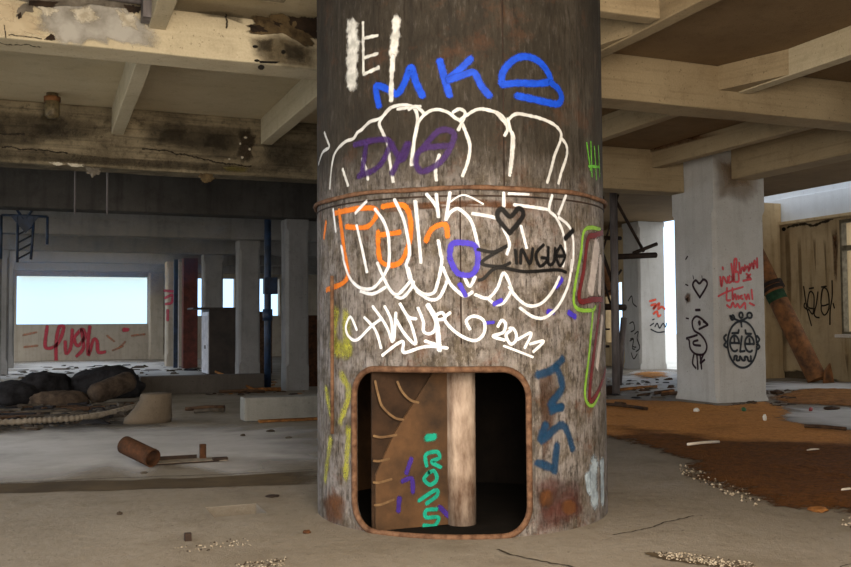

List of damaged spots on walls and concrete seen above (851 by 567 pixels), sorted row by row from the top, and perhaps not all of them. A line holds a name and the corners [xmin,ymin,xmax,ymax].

peeling [16,0,153,46]
spalling [246,14,317,46]
water stain [256,38,311,66]
crack [0,133,68,154]
water stain [30,154,242,171]
crack [142,148,252,167]
crack [497,549,573,567]